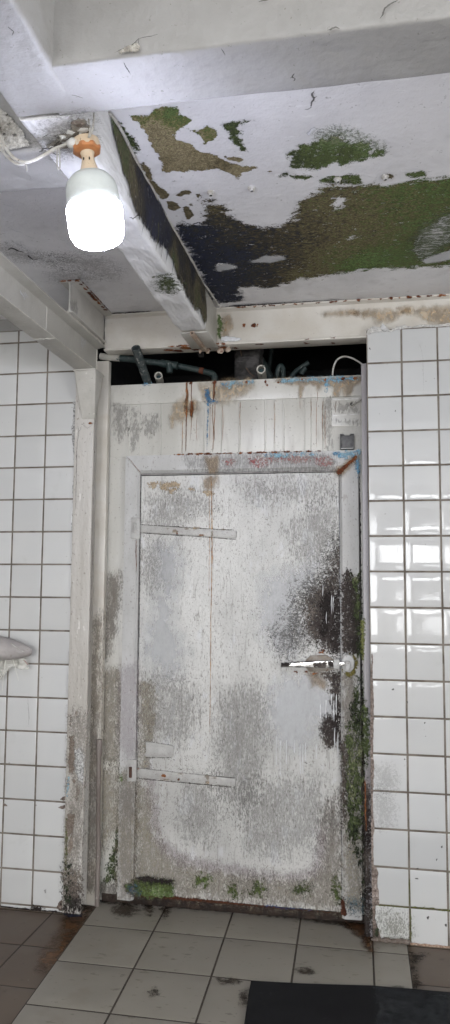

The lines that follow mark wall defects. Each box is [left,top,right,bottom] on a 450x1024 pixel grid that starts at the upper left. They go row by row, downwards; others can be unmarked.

peeling [131,106,272,220]
leakage [111,117,450,323]
rust [177,367,321,455]
mould [268,526,363,754]
leakage [101,572,342,916]
mould [60,818,84,915]